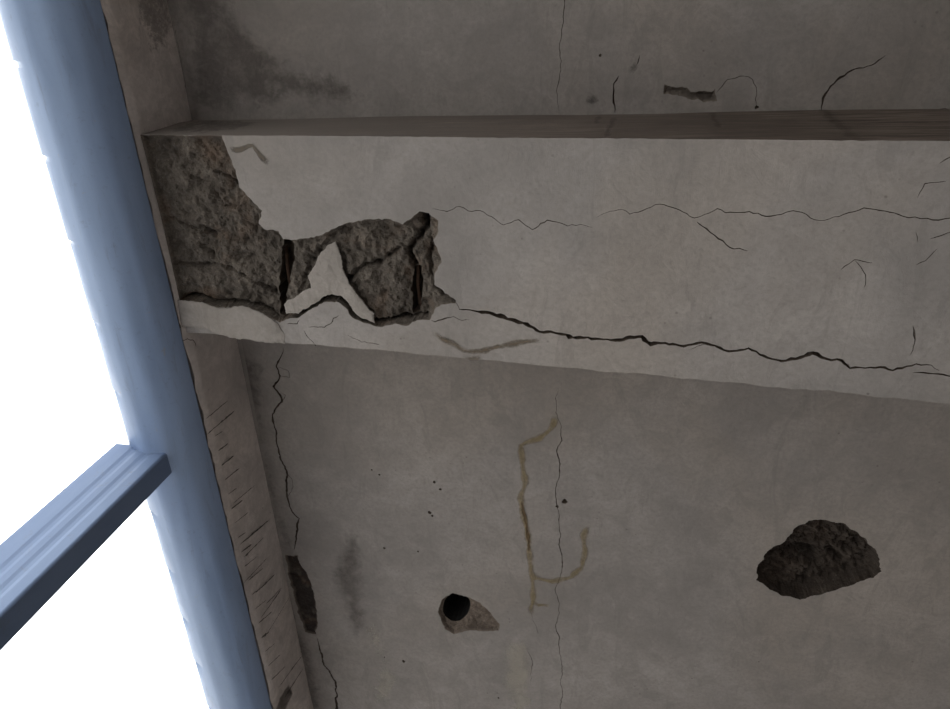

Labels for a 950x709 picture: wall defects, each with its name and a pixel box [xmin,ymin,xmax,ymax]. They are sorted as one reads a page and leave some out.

crack [556,0,565,107]
spalling [663,84,717,102]
crack [821,57,883,110]
spalling [141,135,456,327]
crack [437,157,950,264]
crack [431,303,950,377]
crack [272,353,300,549]
peeling [285,555,318,634]
crack [526,393,563,709]
water stain [519,420,587,609]
crack [317,639,338,709]